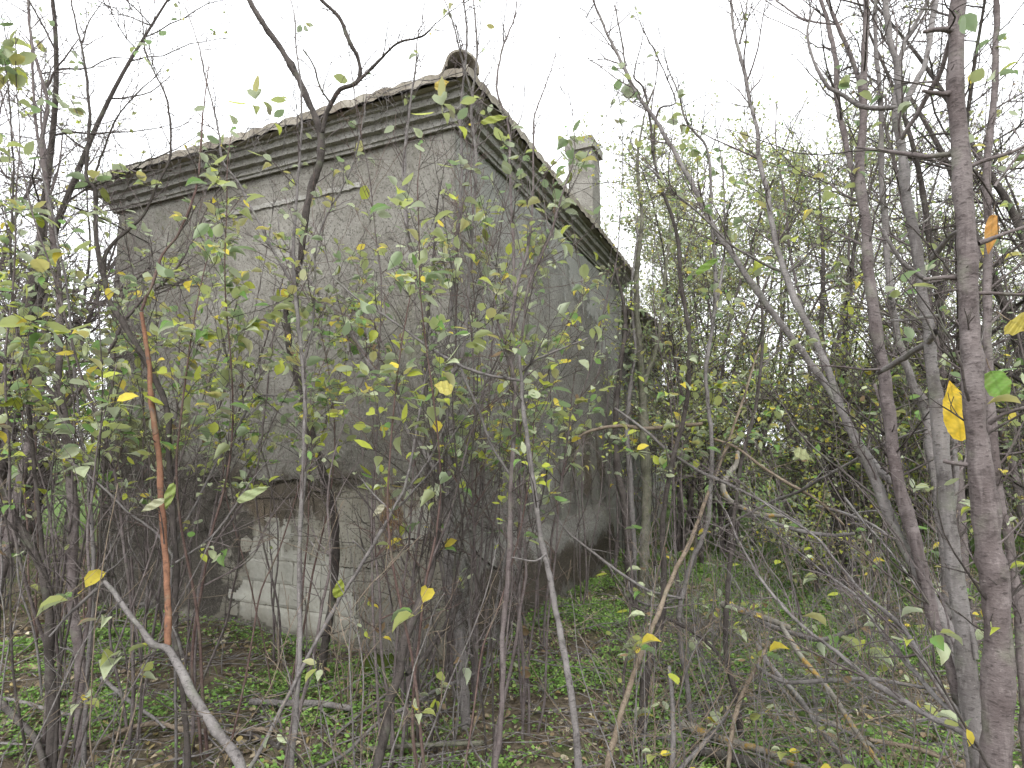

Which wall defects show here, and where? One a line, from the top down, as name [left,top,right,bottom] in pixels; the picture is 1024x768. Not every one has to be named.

flaking render [220,517,371,646]